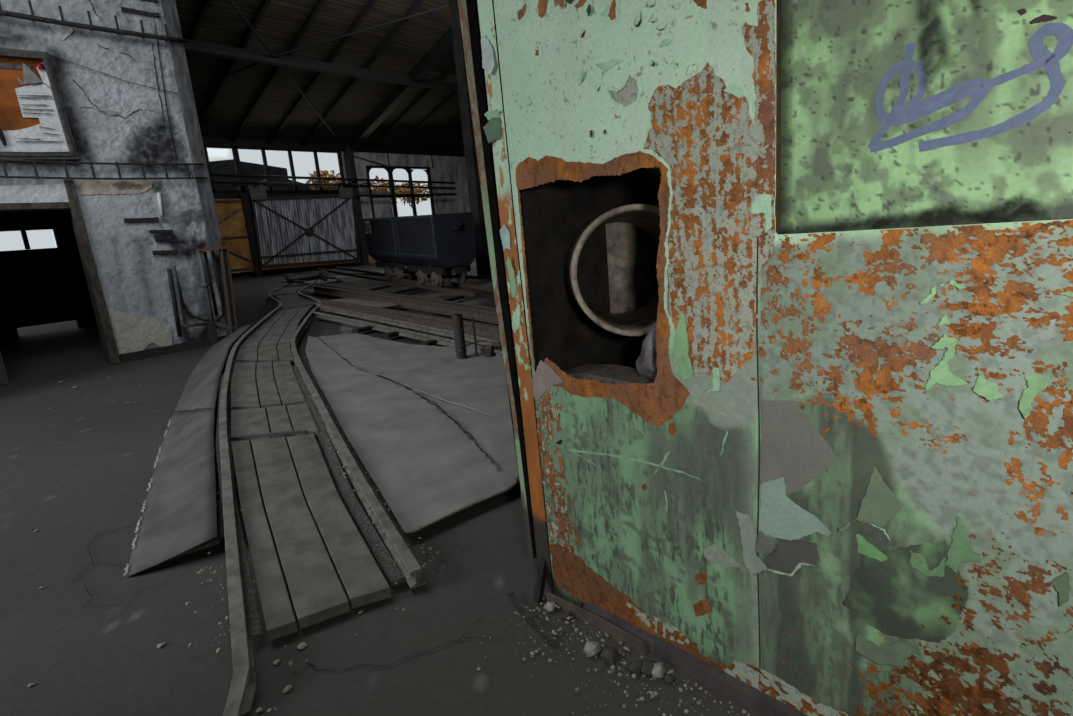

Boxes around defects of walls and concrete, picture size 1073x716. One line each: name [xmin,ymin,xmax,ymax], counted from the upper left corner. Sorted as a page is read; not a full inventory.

peeling [551,0,592,16]
peeling [634,0,672,47]
crack [73,0,166,136]
peeling [595,72,643,113]
peeling [704,467,983,643]